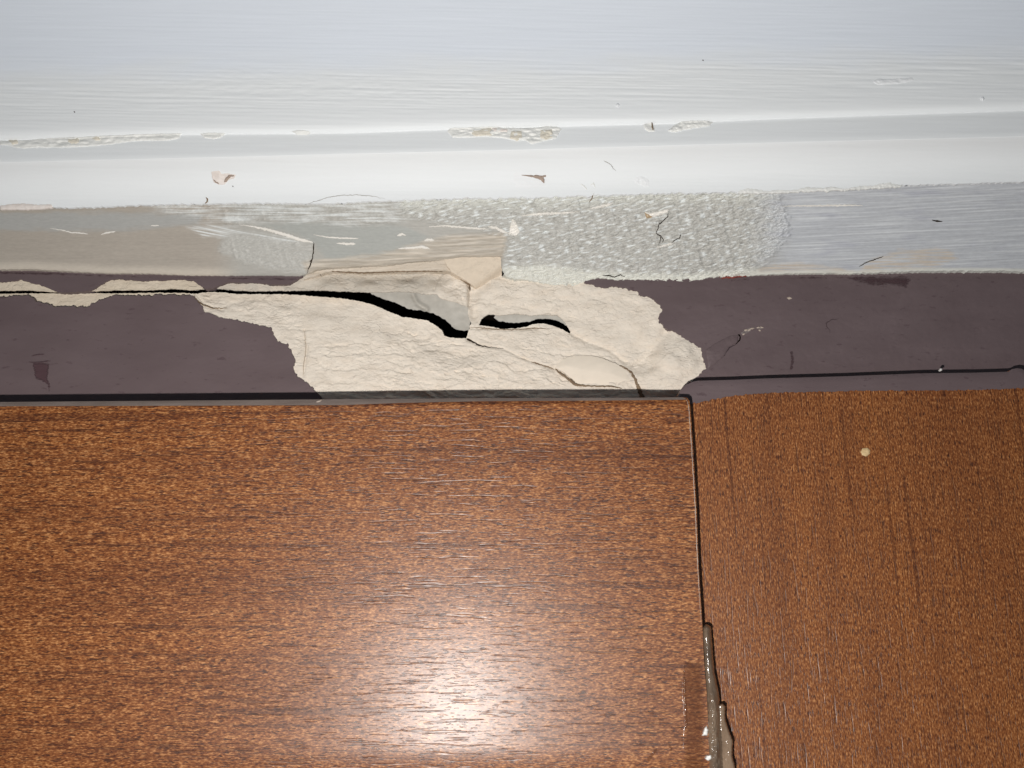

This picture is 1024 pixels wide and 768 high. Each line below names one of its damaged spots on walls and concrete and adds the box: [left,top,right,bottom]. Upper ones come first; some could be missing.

peeling [447,126,561,144]
peeling [645,209,669,218]
peeling [509,219,519,236]
crack [532,362,645,398]
flaking render [0,257,706,615]